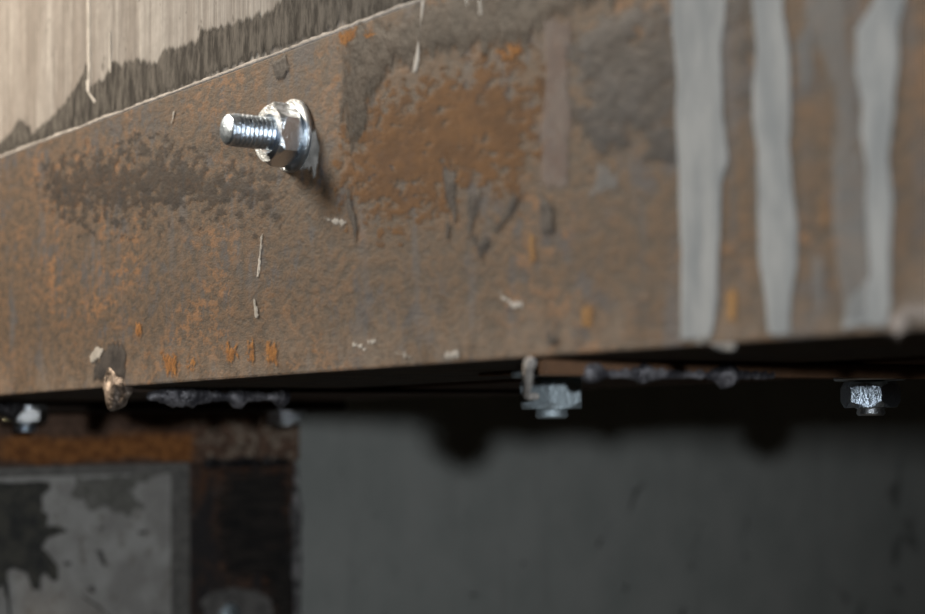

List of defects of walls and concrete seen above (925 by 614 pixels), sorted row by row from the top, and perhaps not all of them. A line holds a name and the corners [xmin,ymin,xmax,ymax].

peeling [0,0,414,155]
leakage [842,0,905,329]
peeling [0,481,71,614]